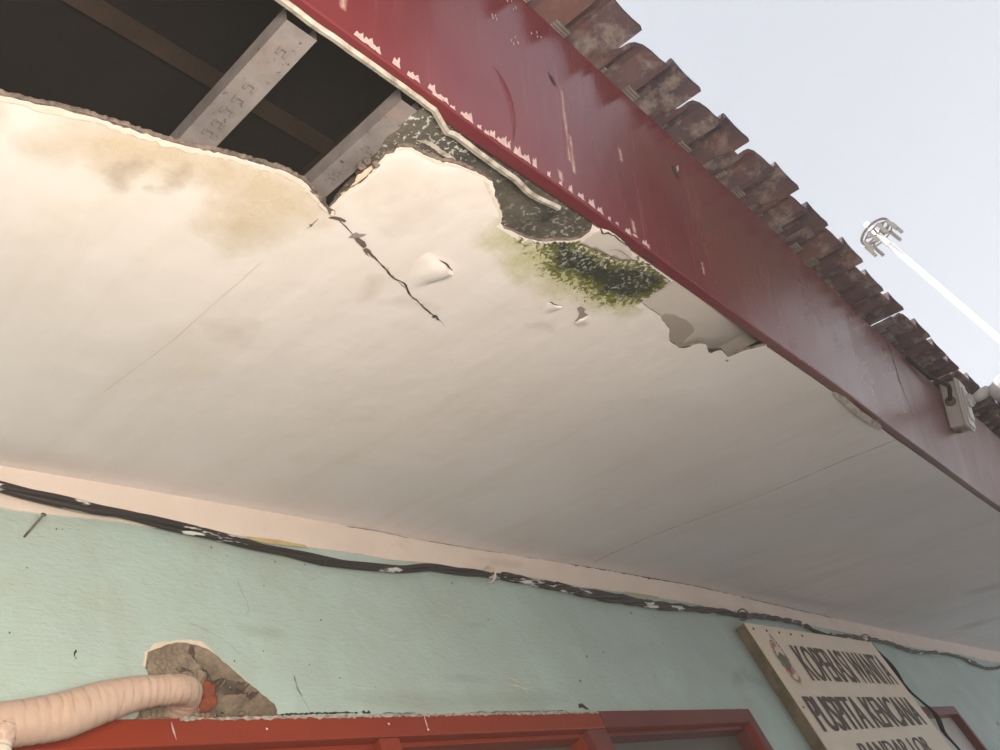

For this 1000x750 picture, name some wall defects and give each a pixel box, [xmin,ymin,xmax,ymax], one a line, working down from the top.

spalling [0,0,657,265]
crack [309,216,446,327]
peeling [643,281,759,362]
flaking render [135,706,174,719]
flaking render [142,640,278,718]